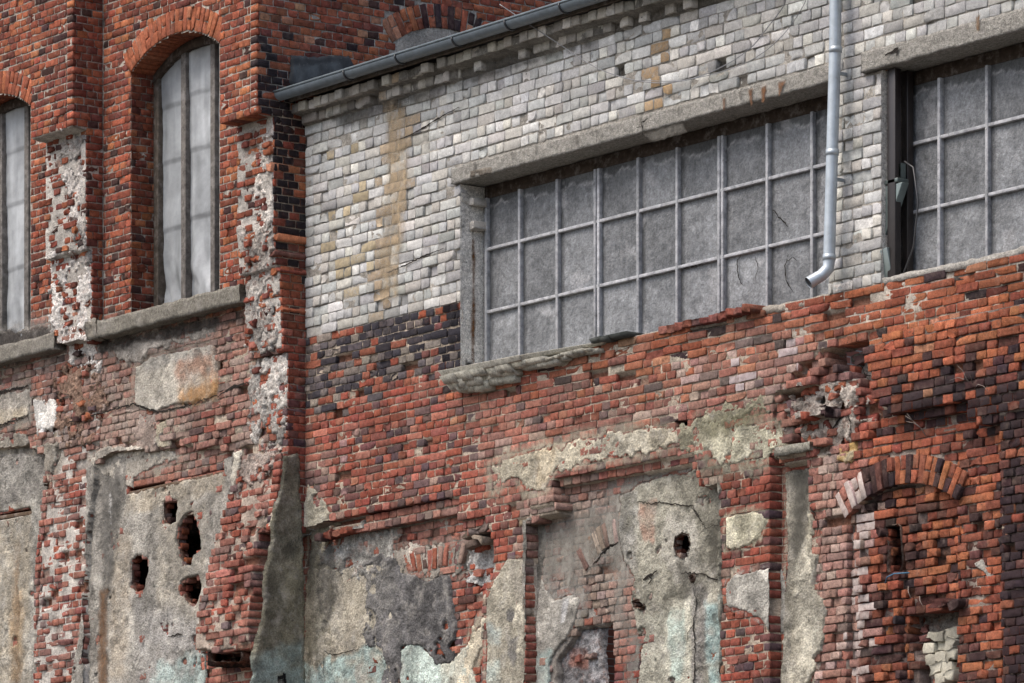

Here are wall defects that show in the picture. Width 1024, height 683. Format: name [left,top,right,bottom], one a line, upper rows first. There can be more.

flaking render [0,125,609,683]
crack [638,501,719,529]
flaking render [488,351,872,683]
rust [98,589,109,683]
crack [682,572,718,683]